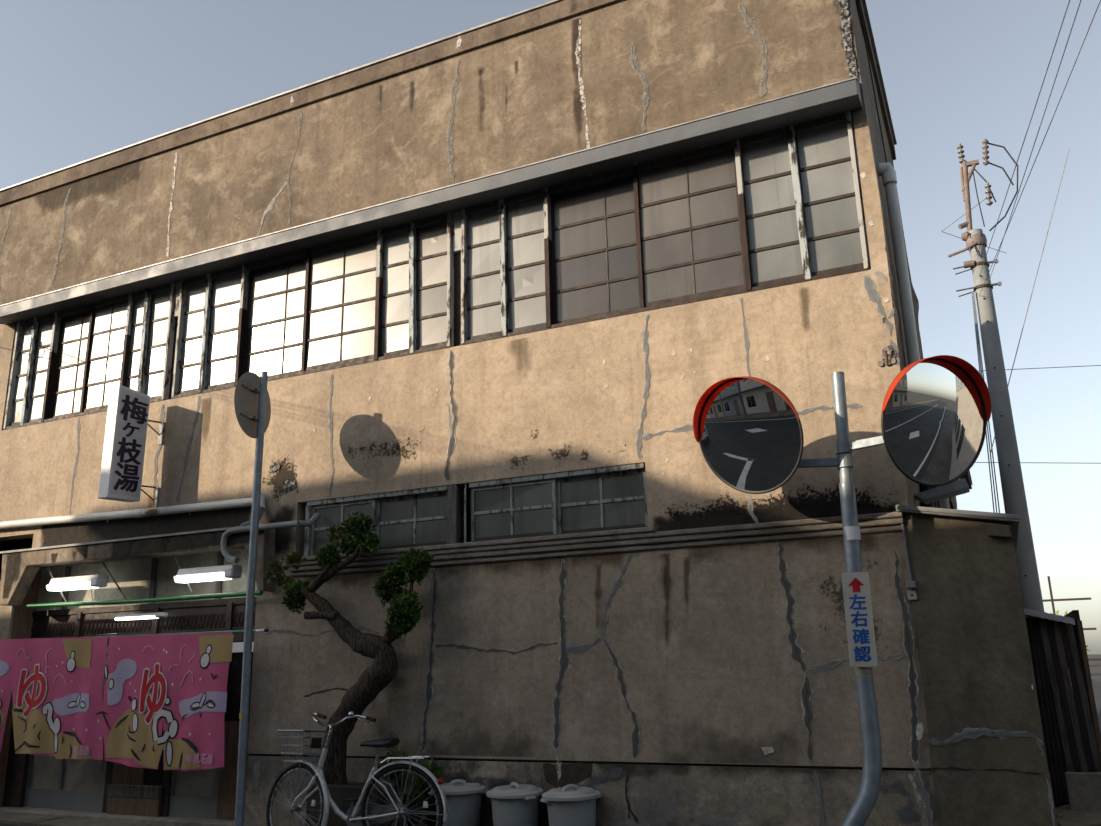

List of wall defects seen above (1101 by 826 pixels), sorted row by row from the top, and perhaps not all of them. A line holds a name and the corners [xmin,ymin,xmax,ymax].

crack [446,35,462,184]
crack [575,20,590,148]
spalling [838,0,858,78]
crack [444,350,459,480]
crack [635,314,693,459]
crack [797,403,862,415]
leakage [654,484,842,531]
crack [747,497,759,523]
leakage [855,488,897,515]
crack [420,555,641,822]
crack [777,542,850,763]
crack [877,552,1055,826]